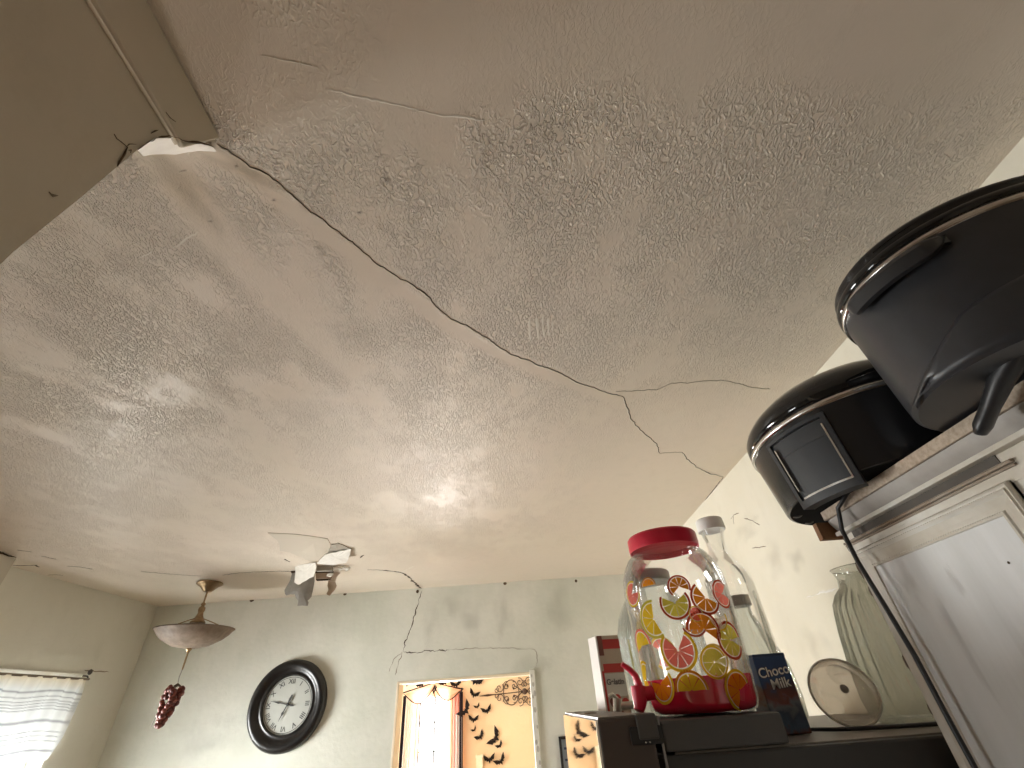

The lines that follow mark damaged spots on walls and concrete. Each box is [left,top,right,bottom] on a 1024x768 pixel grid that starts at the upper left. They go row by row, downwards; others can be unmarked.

crack [114,112,769,500]
flaking render [268,533,352,606]
crack [360,555,538,674]